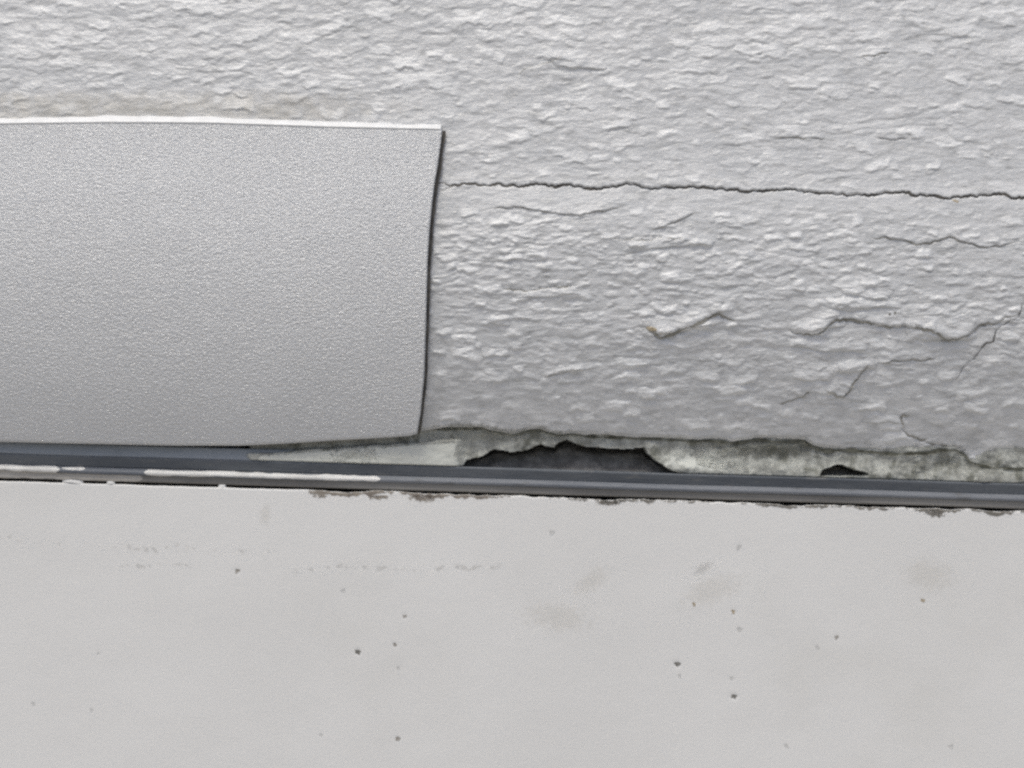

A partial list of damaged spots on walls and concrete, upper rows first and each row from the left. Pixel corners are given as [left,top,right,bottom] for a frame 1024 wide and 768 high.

crack [418,131,1024,470]
spalling [464,440,676,473]
hole [820,465,863,475]